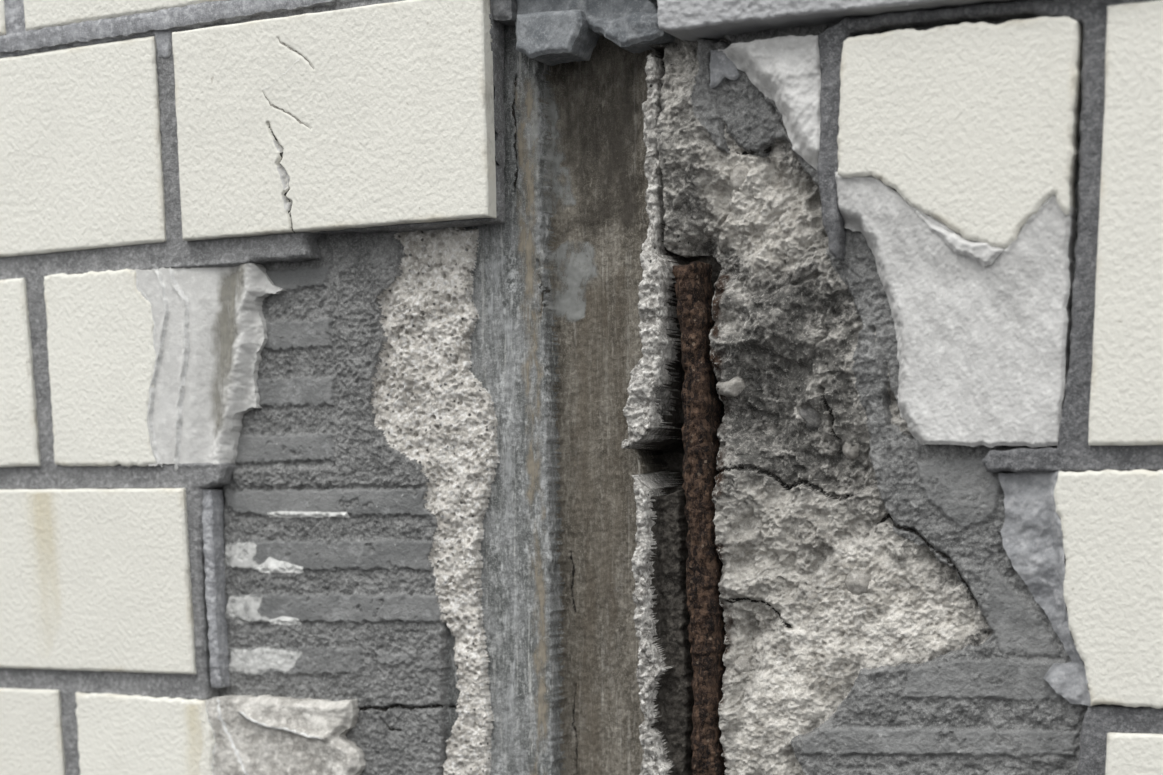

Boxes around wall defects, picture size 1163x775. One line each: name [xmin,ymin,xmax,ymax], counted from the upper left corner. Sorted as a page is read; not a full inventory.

crack [263,38,314,233]
spalling [370,227,500,775]
rust [710,275,729,371]
spalling [649,35,993,775]
spalling [835,172,1077,448]
spalling [998,471,1093,707]
spalling [205,695,366,775]